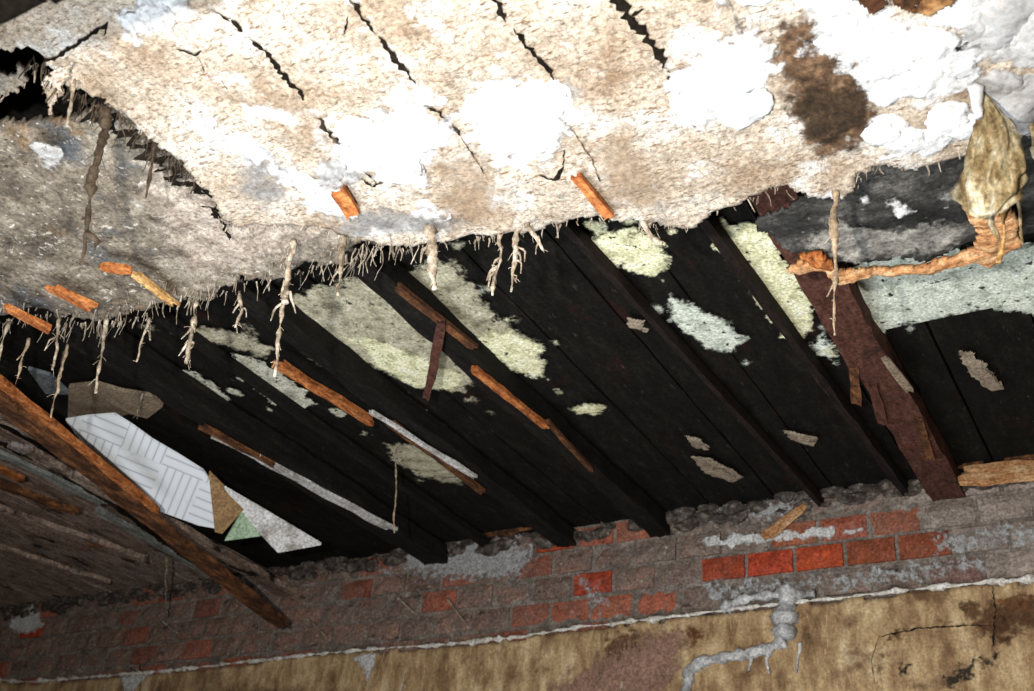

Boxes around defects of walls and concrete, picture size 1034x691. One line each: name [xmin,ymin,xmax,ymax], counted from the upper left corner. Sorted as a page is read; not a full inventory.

crack [210,8,345,148]
crack [344,0,489,182]
crack [492,0,554,81]
crack [609,0,681,98]
damp [585,219,676,282]
peeling [627,317,649,333]
peeling [573,403,605,415]
peeling [958,350,1004,391]
peeling [684,435,743,482]
damp [744,501,812,521]
damp [703,521,1034,600]
damp [942,594,1034,689]